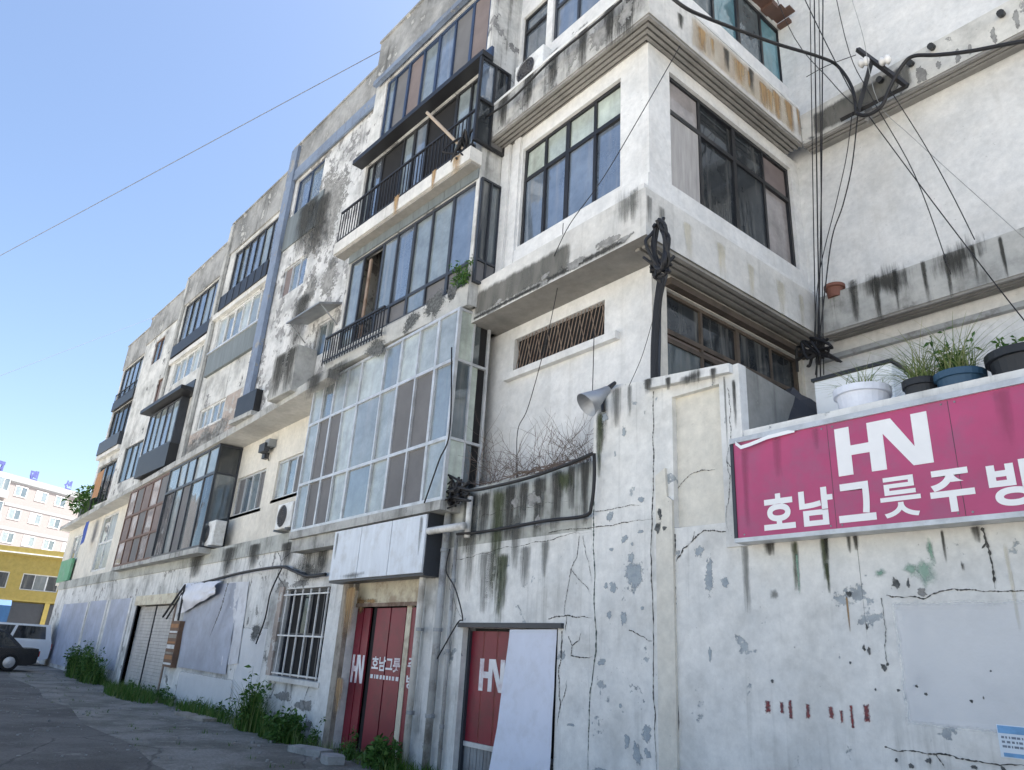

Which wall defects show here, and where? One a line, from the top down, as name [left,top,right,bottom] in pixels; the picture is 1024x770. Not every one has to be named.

corrosion [699,27,714,50]
corrosion [735,60,800,131]
peeling [303,167,350,302]
leakage [849,269,907,315]
leakage [272,294,309,391]
leakage [464,387,630,613]
crack [449,388,731,769]
peeling [604,509,667,593]
leakage [821,538,829,589]
spalling [892,577,927,597]
crack [881,527,1024,667]
crack [884,746,1024,766]